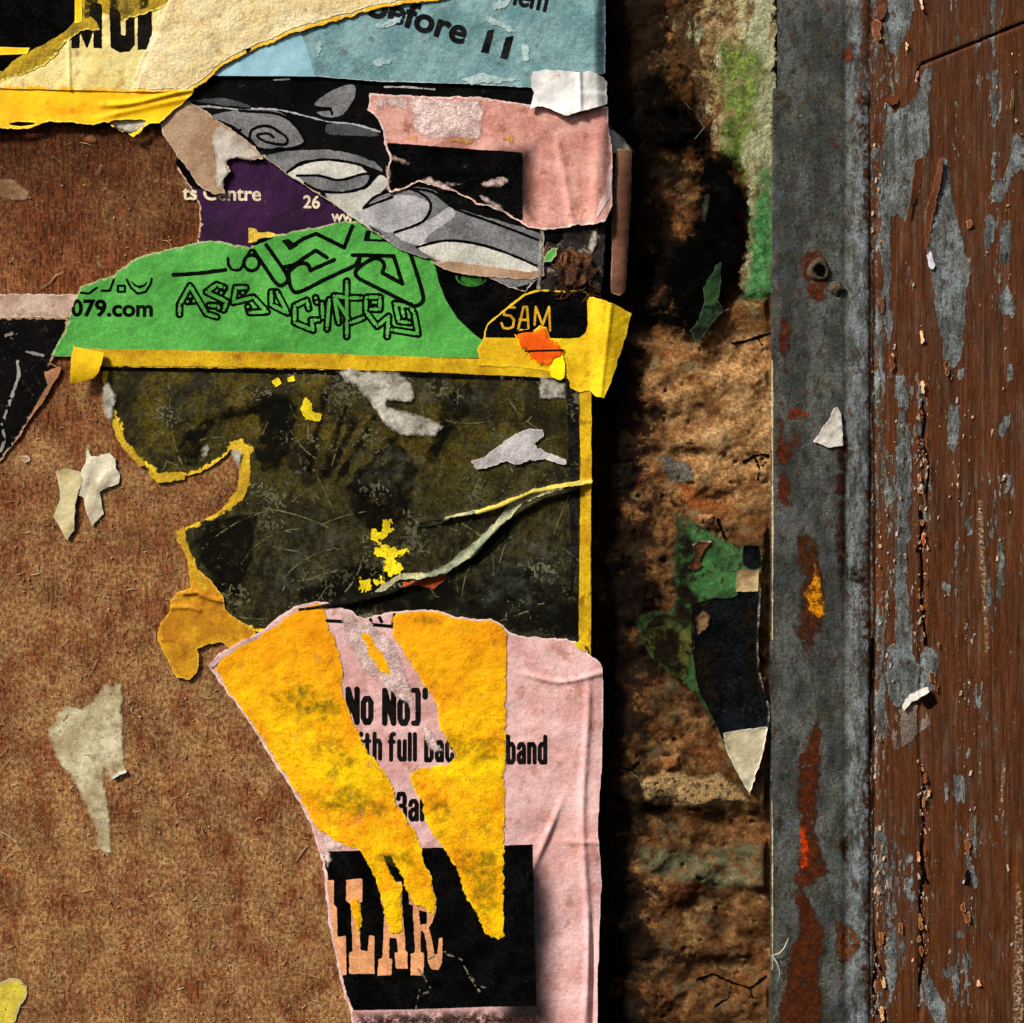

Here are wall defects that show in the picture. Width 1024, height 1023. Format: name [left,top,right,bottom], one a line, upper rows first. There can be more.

corrosion [802,251,826,301]
crack [915,399,940,648]
peeling [870,64,1024,750]
corrosion [776,278,874,1023]
crack [917,766,929,985]
peeling [917,759,930,838]